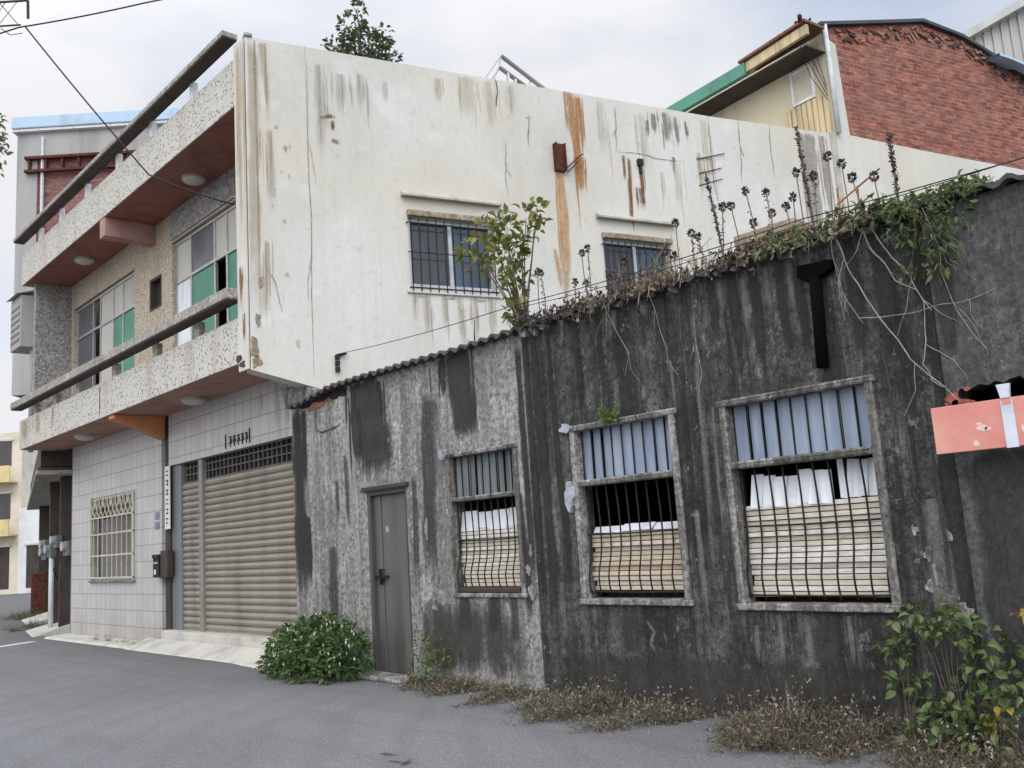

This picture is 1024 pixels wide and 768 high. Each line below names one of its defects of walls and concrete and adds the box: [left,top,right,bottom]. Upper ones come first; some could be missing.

corrosion [554,91,587,297]
corrosion [622,156,646,223]
leakage [293,411,312,587]
leakage [329,548,337,617]
leakage [336,378,390,518]
leakage [412,350,477,569]
leakage [423,323,583,675]
flaking render [923,528,975,619]